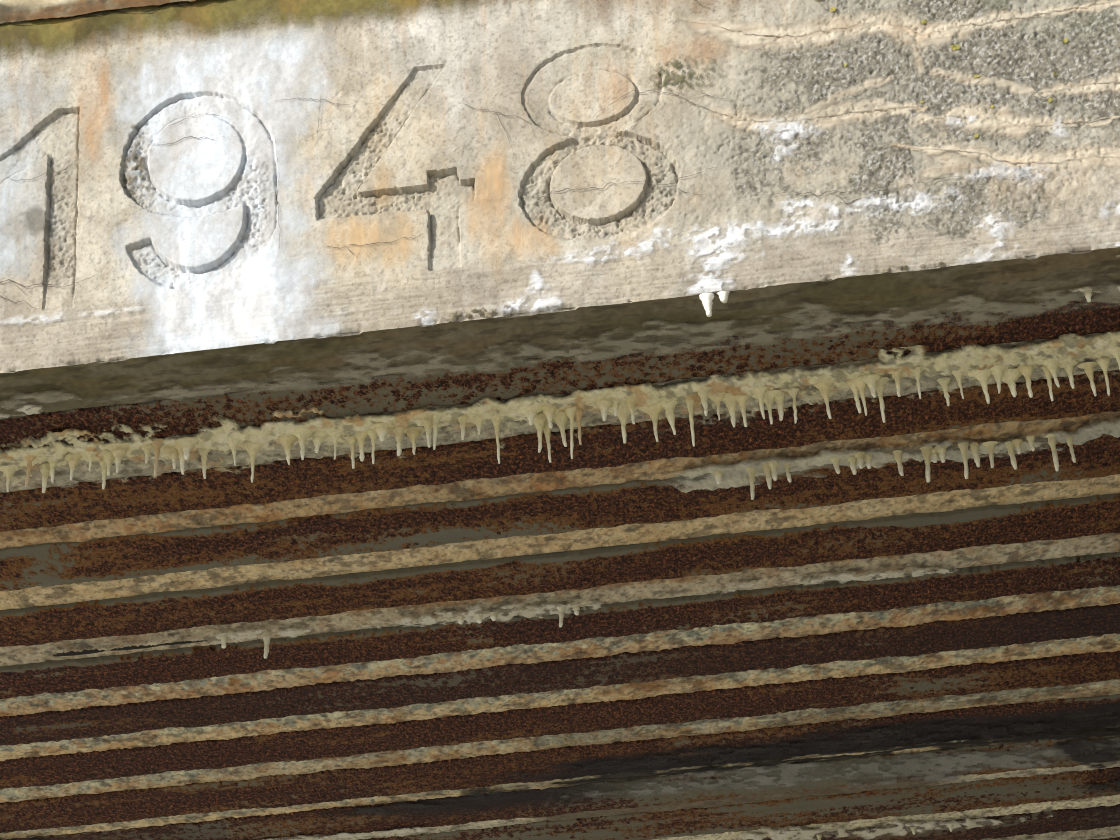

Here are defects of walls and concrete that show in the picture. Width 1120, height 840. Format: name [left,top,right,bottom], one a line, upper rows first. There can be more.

crack [593,89,1120,204]
crack [964,69,1120,95]
efflorescence [146,191,1120,400]
efflorescence [0,332,1120,500]